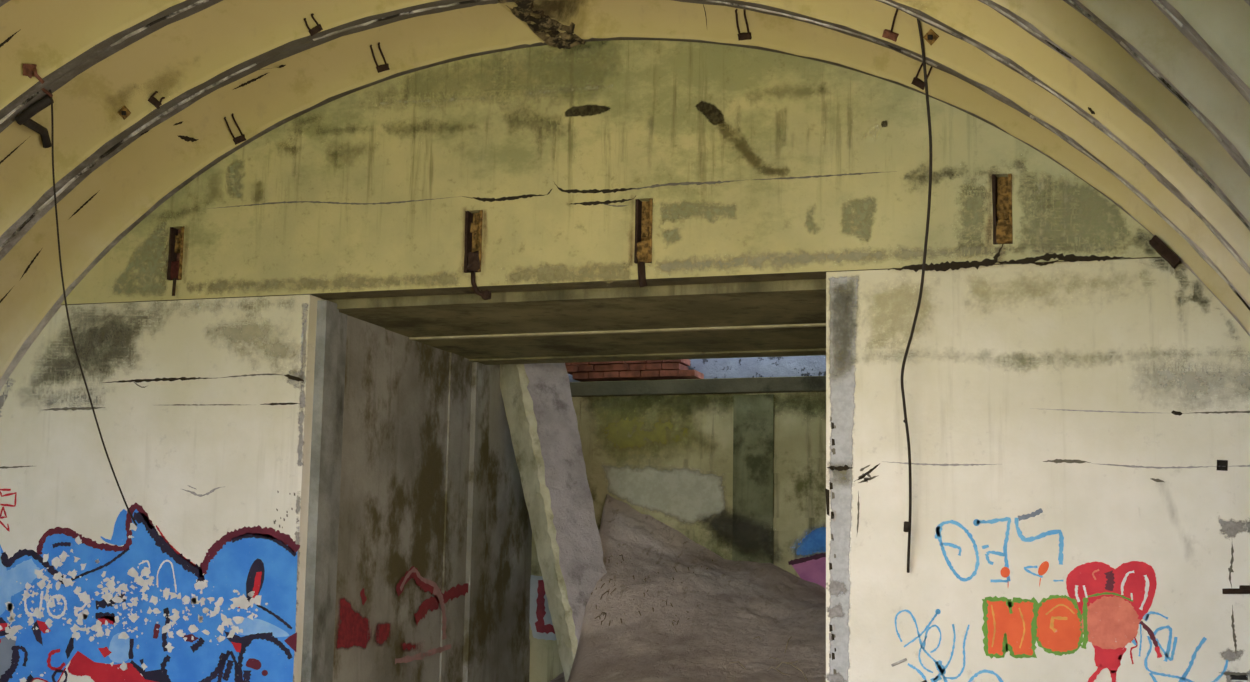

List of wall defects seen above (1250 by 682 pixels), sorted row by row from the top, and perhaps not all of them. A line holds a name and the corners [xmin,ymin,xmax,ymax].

crack [208,171,897,209]
crack [888,243,1131,272]
water stain [34,308,169,385]